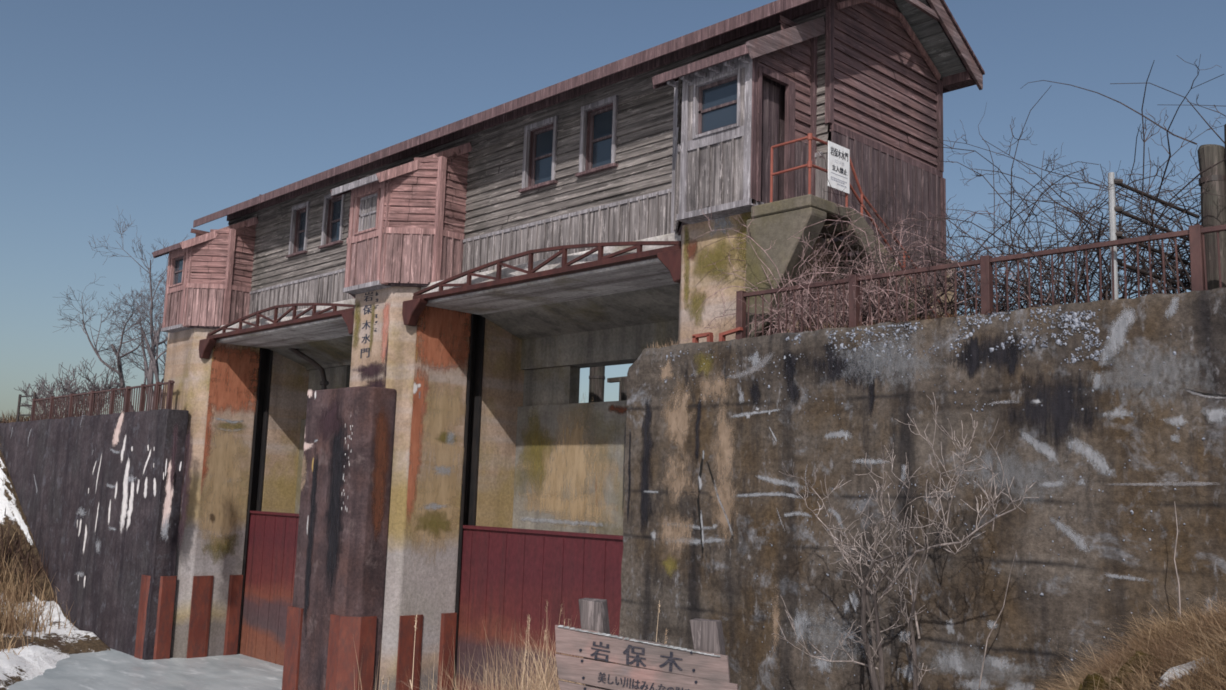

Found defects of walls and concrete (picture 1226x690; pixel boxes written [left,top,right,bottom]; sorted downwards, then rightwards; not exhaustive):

water stain [684,212,753,321]
rust [200,344,259,538]
rust [407,306,471,546]
water stain [729,343,904,441]
water stain [950,311,1211,486]
water stain [1207,410,1226,421]